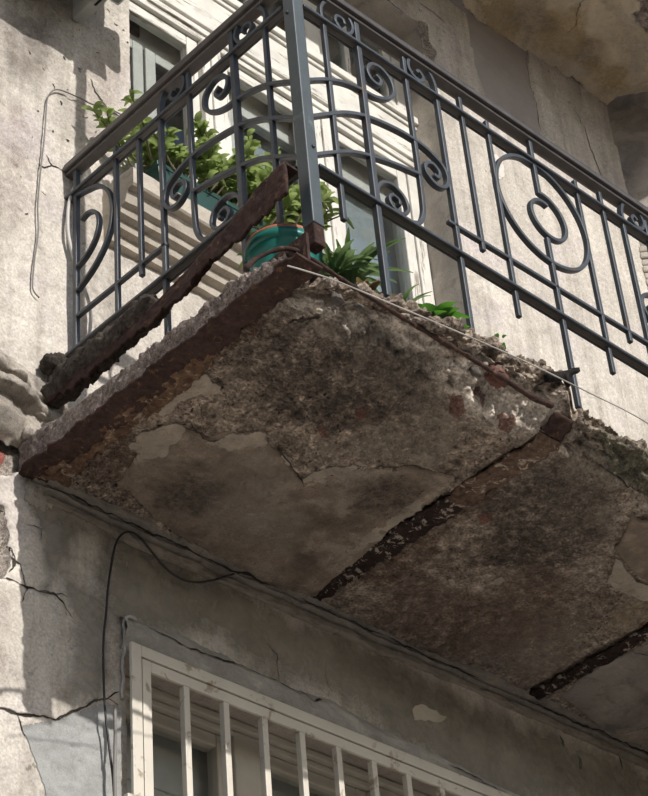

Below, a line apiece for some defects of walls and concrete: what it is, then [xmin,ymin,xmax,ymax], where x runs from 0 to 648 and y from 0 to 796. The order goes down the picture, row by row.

spalling [417,20,437,61]
spalling [243,246,300,271]
spalling [310,256,554,409]
spalling [448,395,465,419]
spalling [495,412,516,432]
crack [0,508,73,618]
crack [0,692,118,736]
peeling [412,704,446,722]